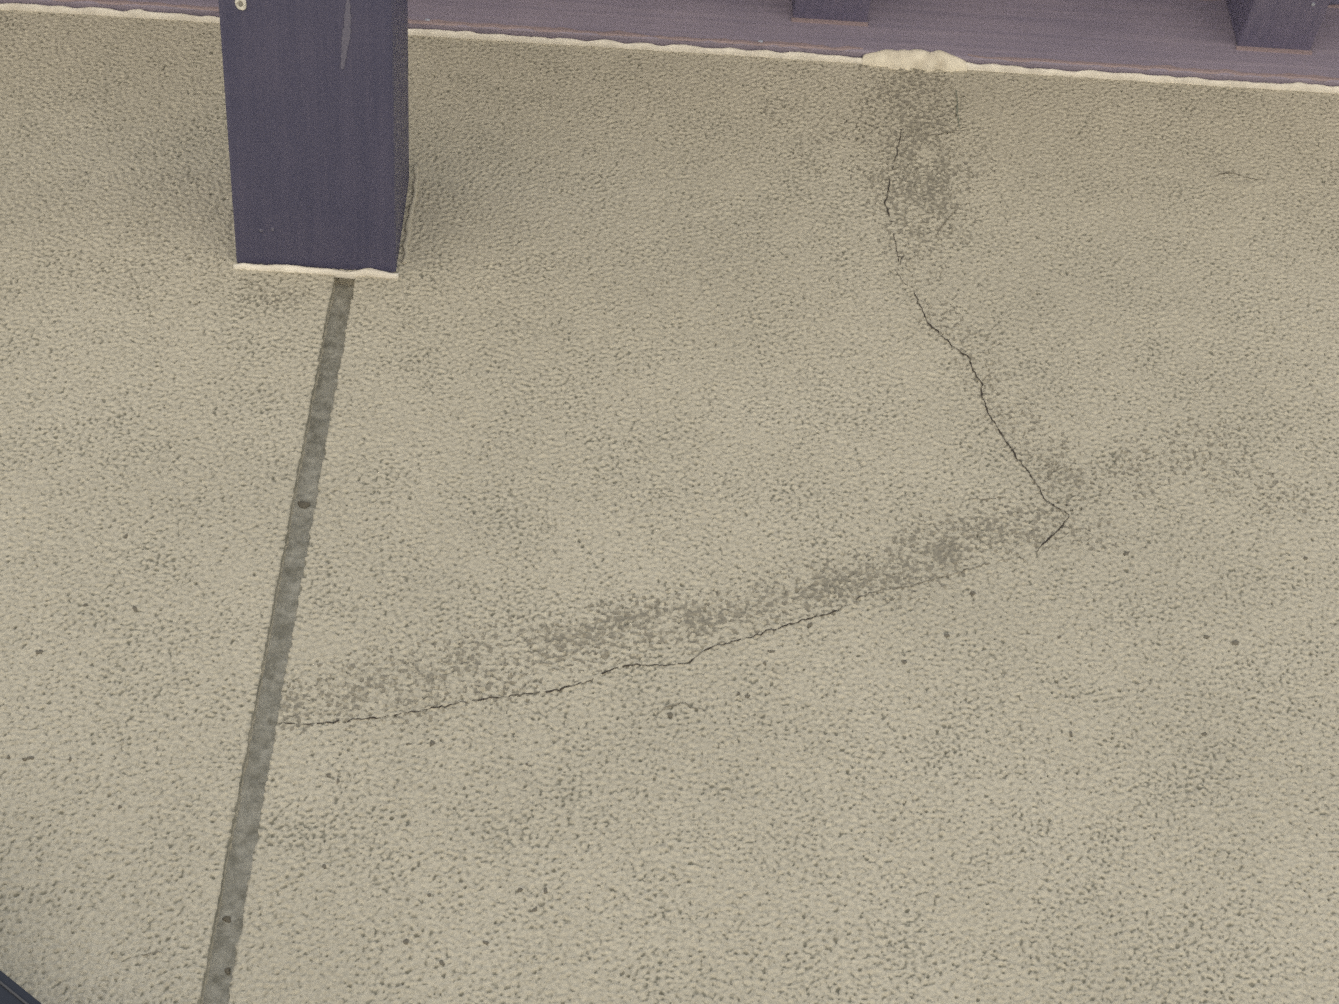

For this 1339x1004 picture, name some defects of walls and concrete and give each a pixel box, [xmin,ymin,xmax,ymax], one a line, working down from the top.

crack [278,90,1072,725]
damp [279,64,1311,739]